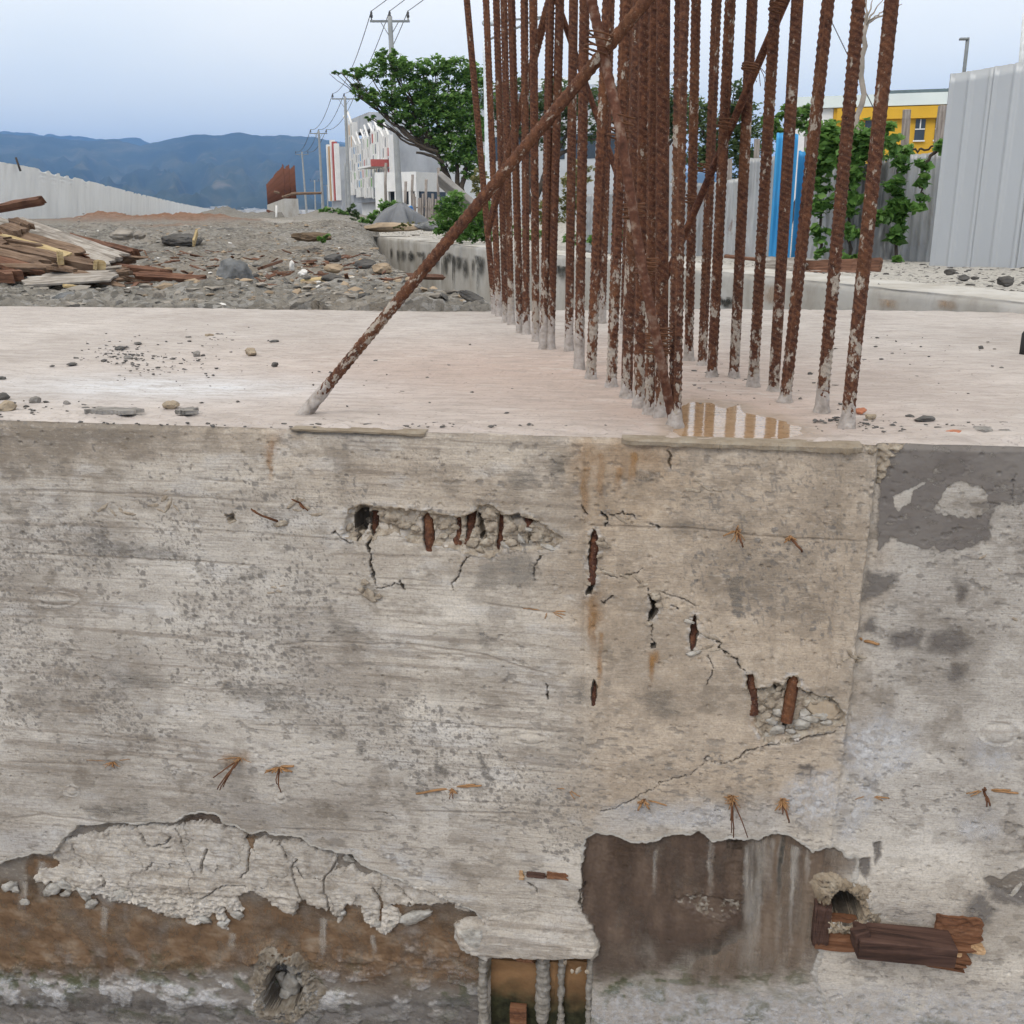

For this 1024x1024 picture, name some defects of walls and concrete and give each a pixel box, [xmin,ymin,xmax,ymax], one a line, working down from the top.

spalling [863,443,909,484]
crack [349,539,405,589]
spalling [341,503,565,559]
spalling [745,673,846,745]
peeling [0,811,483,959]
leakage [0,857,487,985]
leakage [581,831,846,978]
peeling [580,828,860,887]